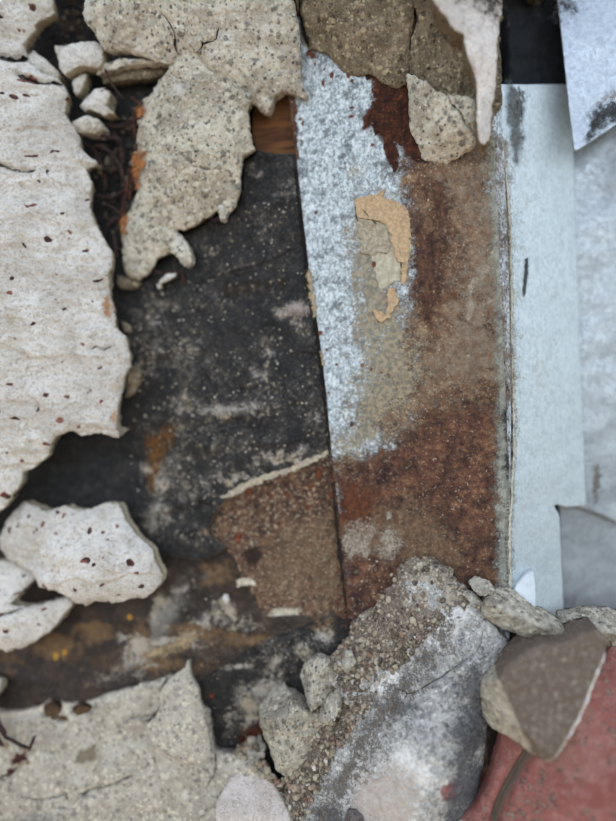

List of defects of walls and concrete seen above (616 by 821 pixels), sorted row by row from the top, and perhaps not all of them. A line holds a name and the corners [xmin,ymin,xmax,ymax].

crack [298,0,309,45]
water stain [446,0,543,36]
corrosion [306,45,353,85]
spalling [493,46,503,117]
corrosion [131,147,148,189]
peeling [354,189,412,322]
corrosion [209,74,519,639]
crack [394,632,483,695]
peeling [146,659,212,765]
crack [22,776,132,800]